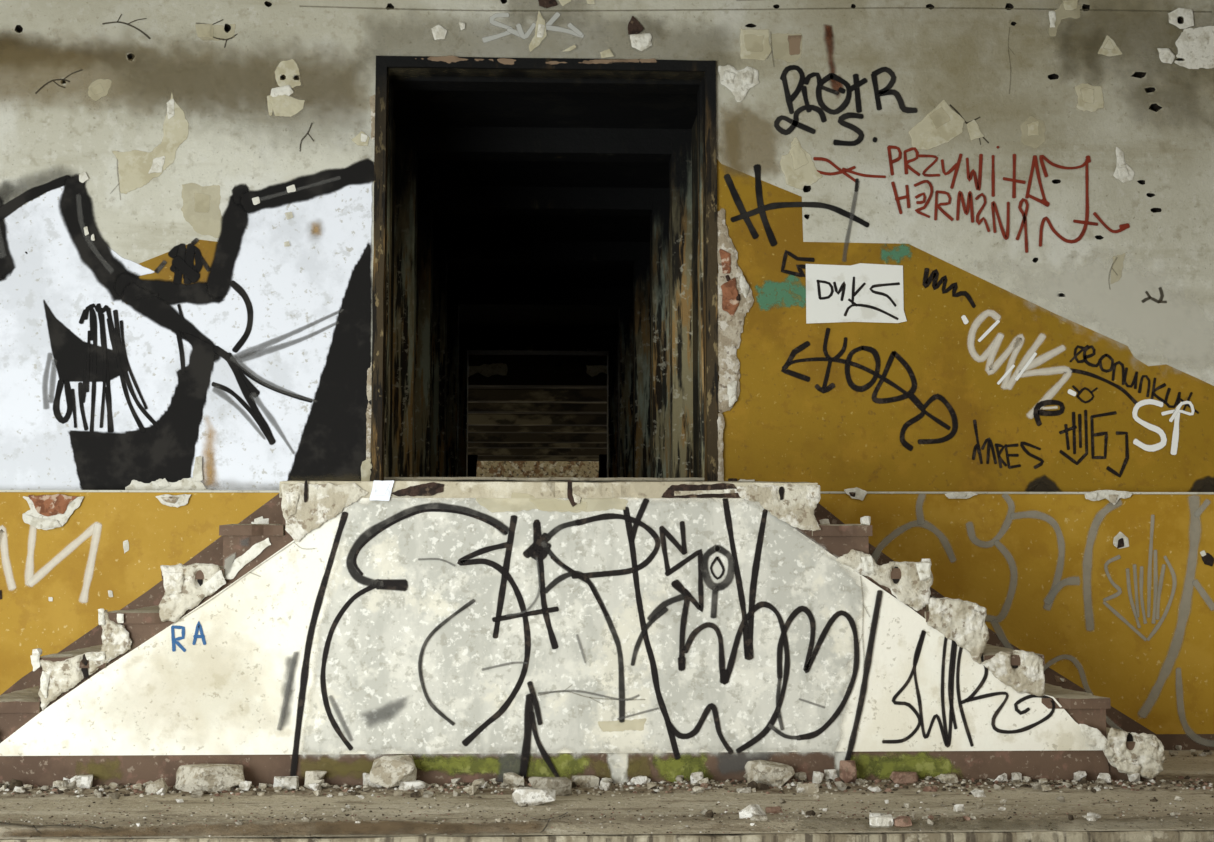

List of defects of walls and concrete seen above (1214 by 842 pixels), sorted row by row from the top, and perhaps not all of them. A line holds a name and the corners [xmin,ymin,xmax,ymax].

damp [0,37,111,66]
spalling [1157,8,1214,69]
flaking render [267,59,305,117]
peeling [113,94,189,194]
spalling [662,208,821,531]
spalling [22,494,84,530]
spalling [1084,490,1132,505]
spalling [1113,532,1129,549]
spalling [159,538,271,622]
spalling [30,590,132,710]
spalling [836,549,1066,696]
spalling [1079,724,1210,779]